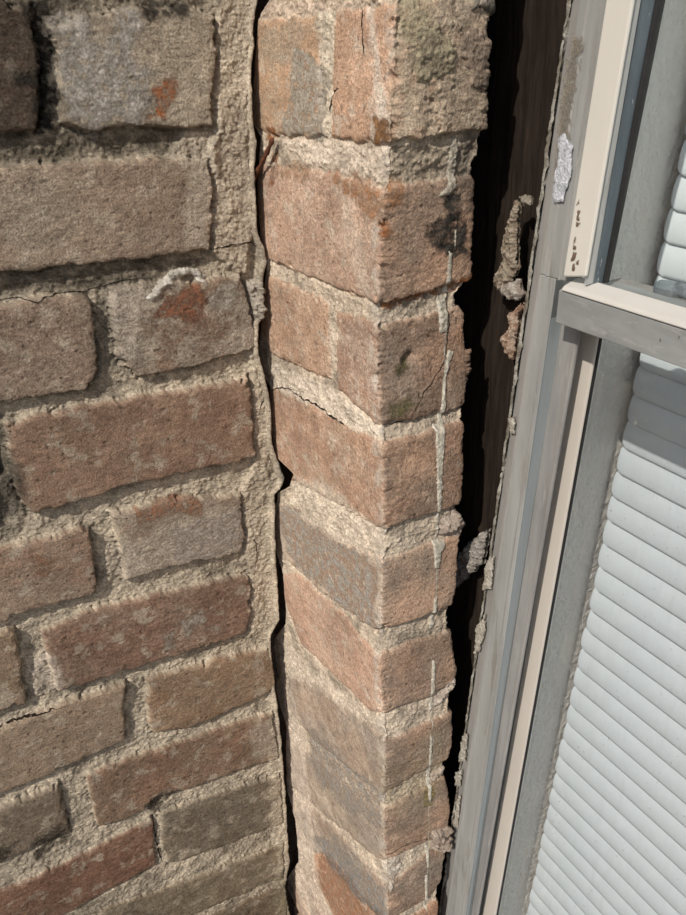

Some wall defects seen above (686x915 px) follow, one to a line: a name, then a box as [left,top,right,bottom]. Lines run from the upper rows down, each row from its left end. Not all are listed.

corrosion [149,79,177,118]
crack [210,0,269,288]
leakage [426,194,468,258]
crack [255,321,263,355]
spalling [499,302,525,360]
crack [259,379,351,425]
crack [271,430,293,506]
crack [0,706,65,727]
crack [254,539,299,915]